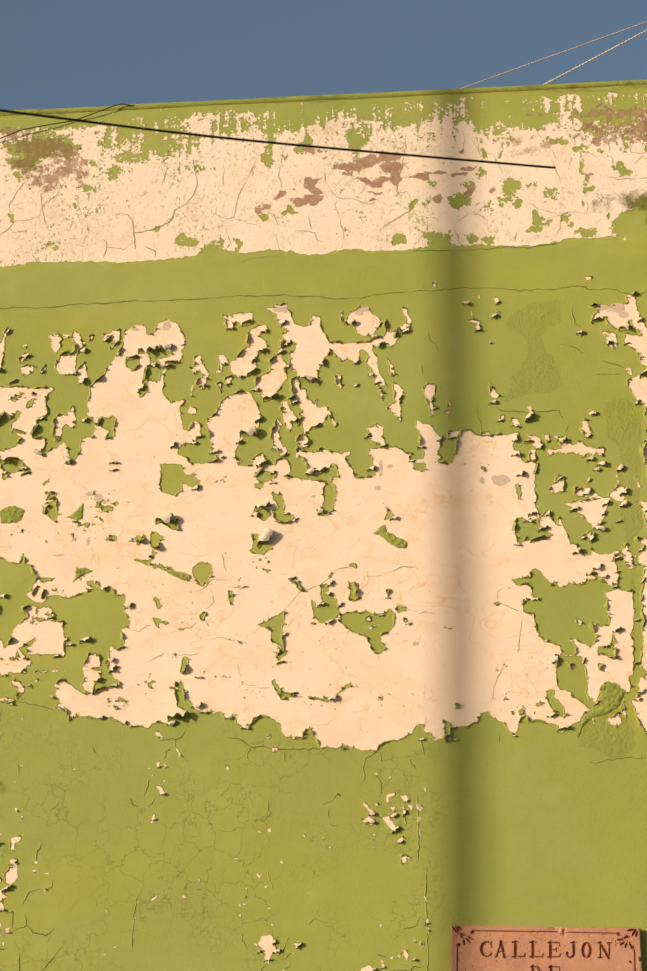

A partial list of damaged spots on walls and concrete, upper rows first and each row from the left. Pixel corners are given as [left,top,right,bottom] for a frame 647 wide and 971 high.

crack [0,182,55,235]
leakage [0,127,88,192]
crack [103,136,319,262]
peeling [0,92,647,268]
crack [366,130,647,251]
leakage [515,101,647,152]
crack [0,285,645,352]
peeling [0,291,647,753]
peeling [361,792,423,865]
peeling [0,832,22,946]
crack [0,880,68,971]
peeling [254,921,304,965]